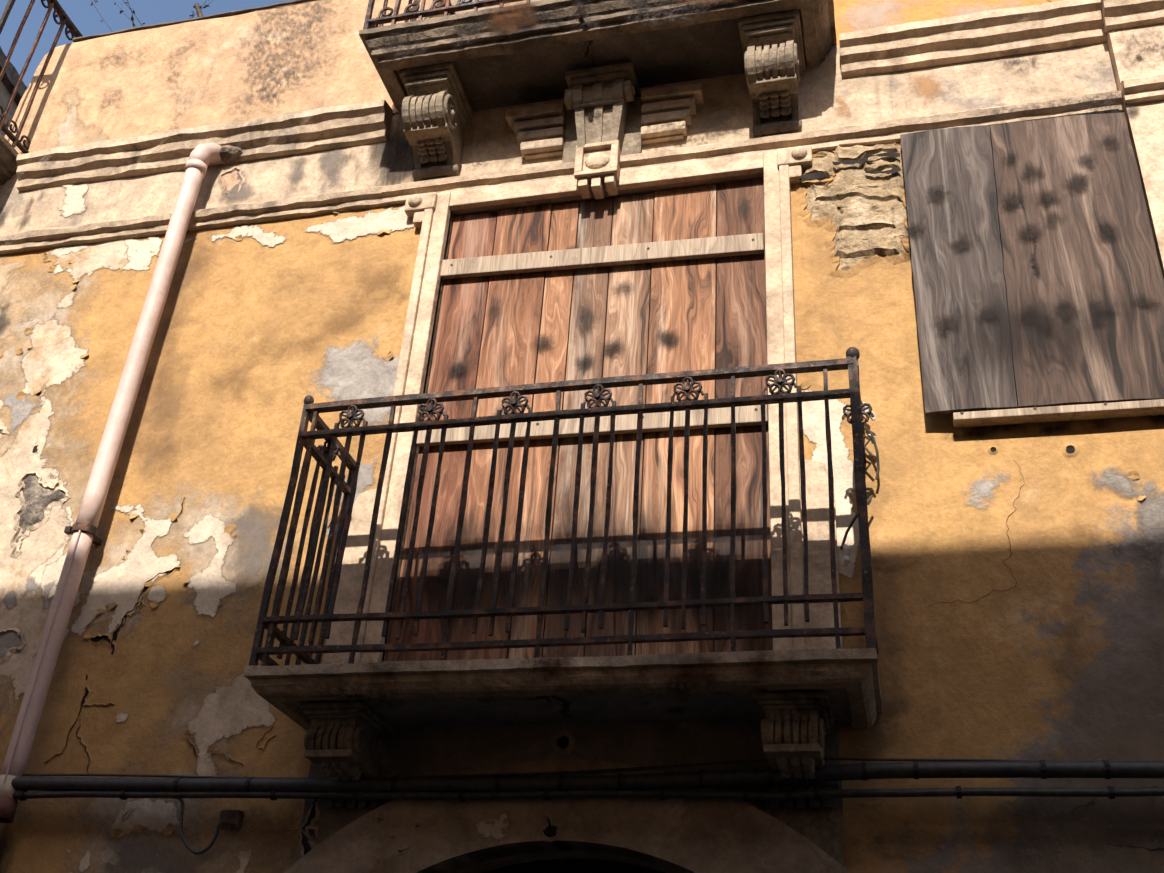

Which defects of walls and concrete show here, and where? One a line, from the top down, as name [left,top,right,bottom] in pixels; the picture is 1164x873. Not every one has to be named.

leakage [245,3,328,101]
peeling [211,225,288,247]
peeling [305,206,414,243]
flaking render [792,142,911,278]
peeling [316,340,399,425]
peeling [0,236,163,723]
crack [89,566,180,655]
peeling [55,487,281,670]
crack [177,497,186,518]
crack [929,459,1026,606]
crack [45,674,115,773]
peeling [161,664,278,777]